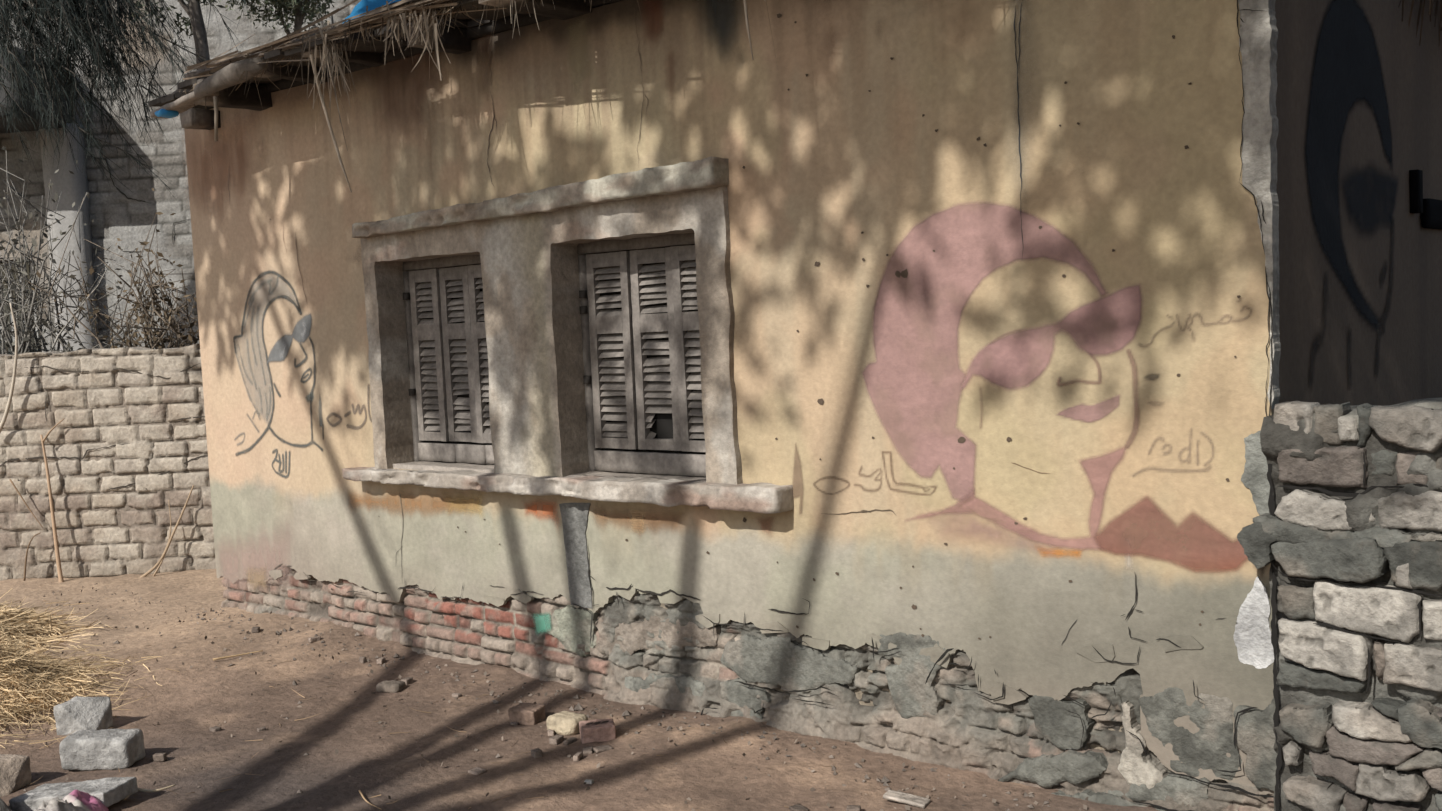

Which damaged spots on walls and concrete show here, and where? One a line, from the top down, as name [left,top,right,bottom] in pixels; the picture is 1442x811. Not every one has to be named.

leakage [703,0,737,49]
spalling [221,565,1274,811]
crack [1062,559,1442,811]